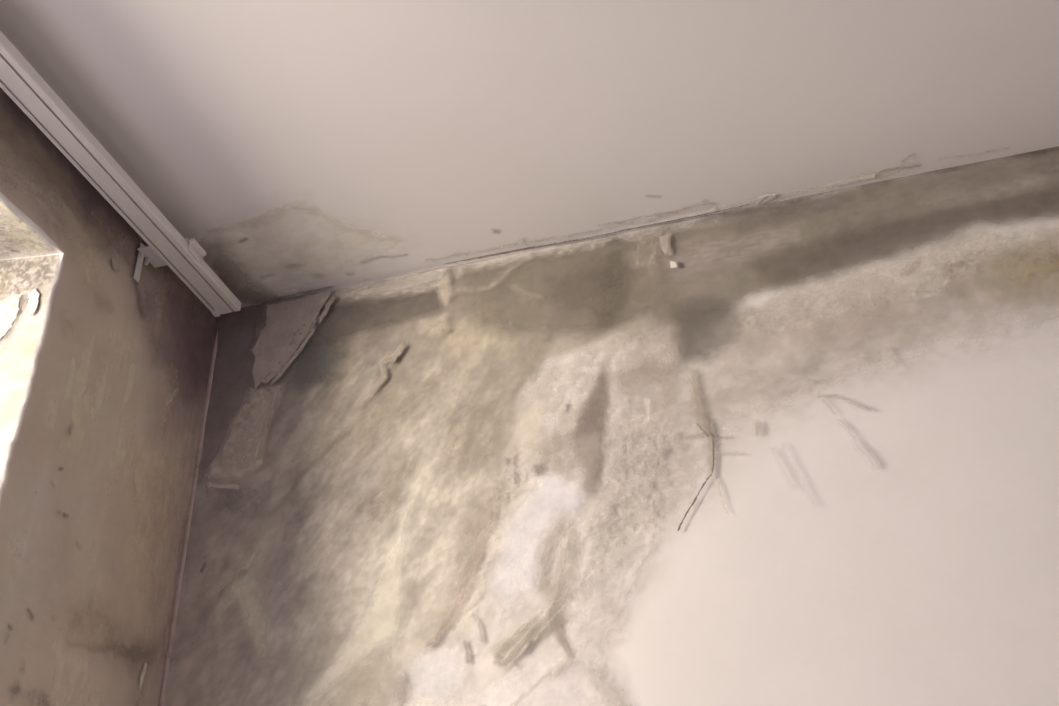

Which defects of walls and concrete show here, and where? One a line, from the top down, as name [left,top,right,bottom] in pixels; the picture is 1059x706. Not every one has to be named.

leakage [0,87,151,266]
peeling [0,286,40,339]
leakage [0,202,58,429]
peeling [213,208,717,476]
leakage [139,146,1059,706]
crack [677,371,715,531]